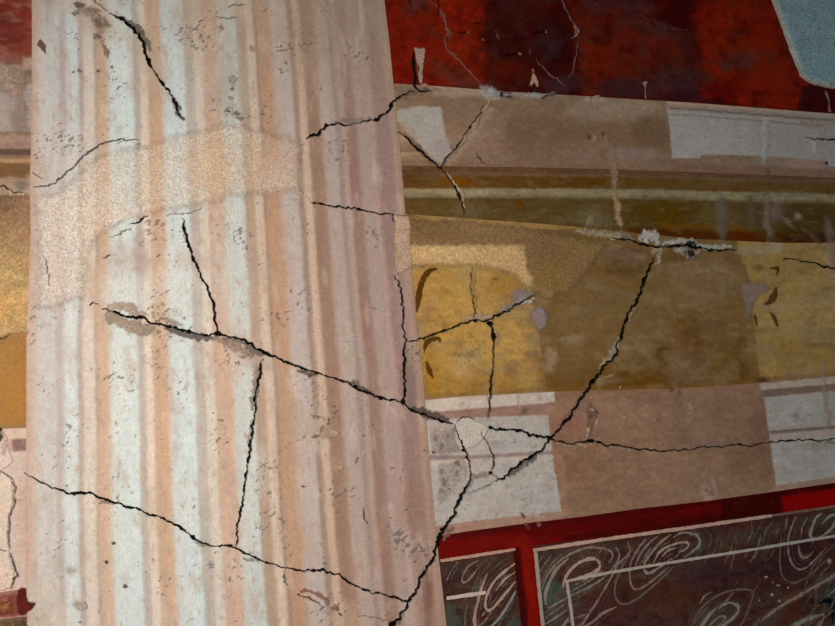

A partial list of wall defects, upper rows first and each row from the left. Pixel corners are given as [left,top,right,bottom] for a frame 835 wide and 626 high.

crack [94,0,185,121]
crack [305,51,430,139]
crack [431,0,579,86]
crack [0,138,138,196]
crack [300,192,417,222]
crack [397,101,490,214]
crack [0,208,835,626]